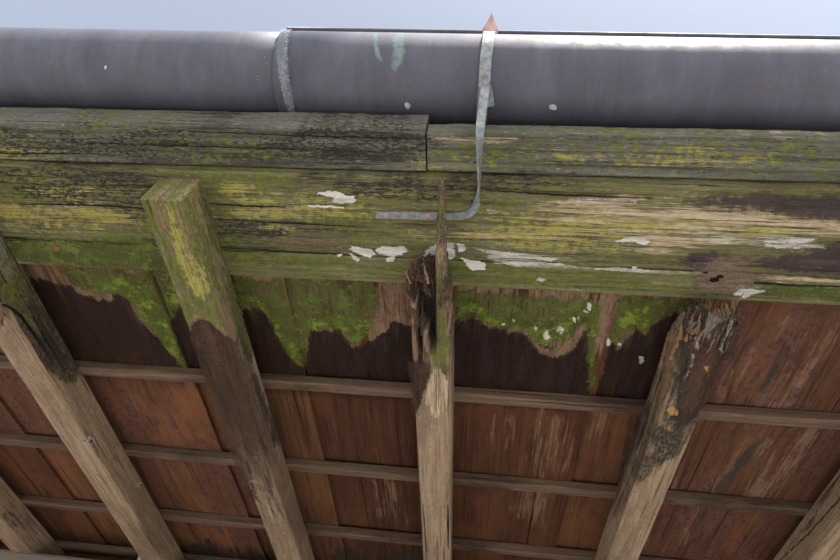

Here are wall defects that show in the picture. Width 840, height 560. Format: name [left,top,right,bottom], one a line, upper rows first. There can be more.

peeling [308,191,356,209]
leakage [688,190,840,225]
peeling [337,246,408,262]
peeling [447,243,572,271]
peeling [615,237,650,245]
leakage [680,252,730,271]
peeling [759,237,826,250]
leakage [748,242,840,278]
leakage [29,277,277,461]
leakage [243,306,429,409]
leakage [454,305,739,423]
crack [780,498,840,560]